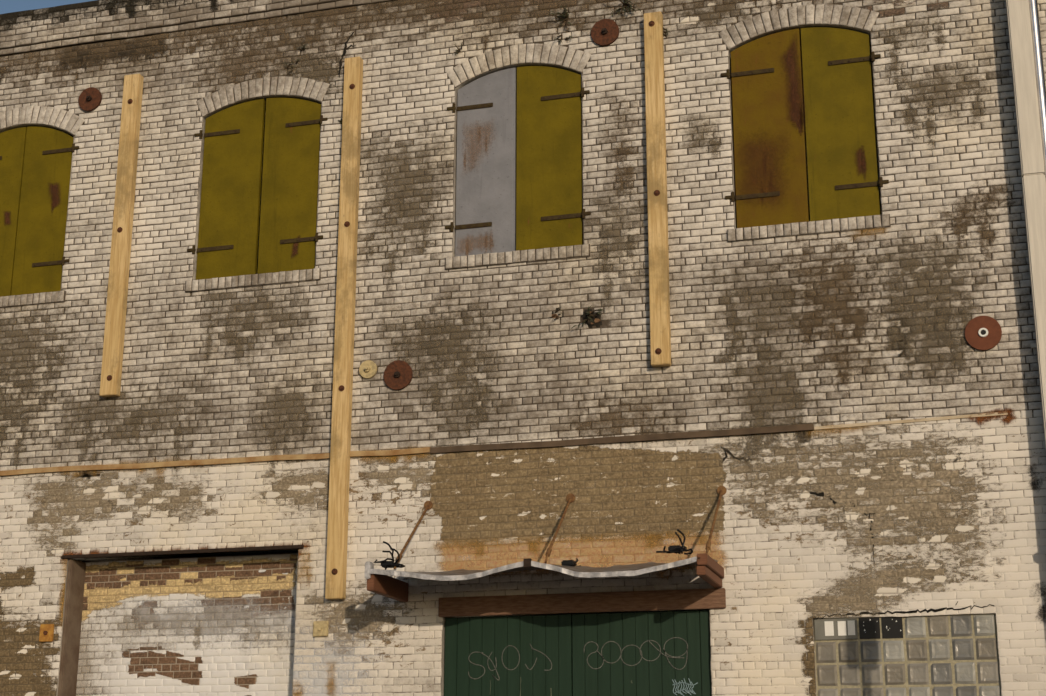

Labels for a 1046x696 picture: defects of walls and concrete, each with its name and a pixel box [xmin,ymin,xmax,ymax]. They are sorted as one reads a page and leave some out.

damp [0,0,782,98]
rust [782,43,804,132]
damp [872,16,1001,145]
damp [358,130,454,285]
damp [0,300,213,475]
damp [713,186,1012,472]
rust [971,409,1015,425]
peeling [0,566,62,696]
peeling [25,471,218,556]
peeling [122,646,203,685]
peeling [82,554,412,655]
peeling [359,414,1007,696]